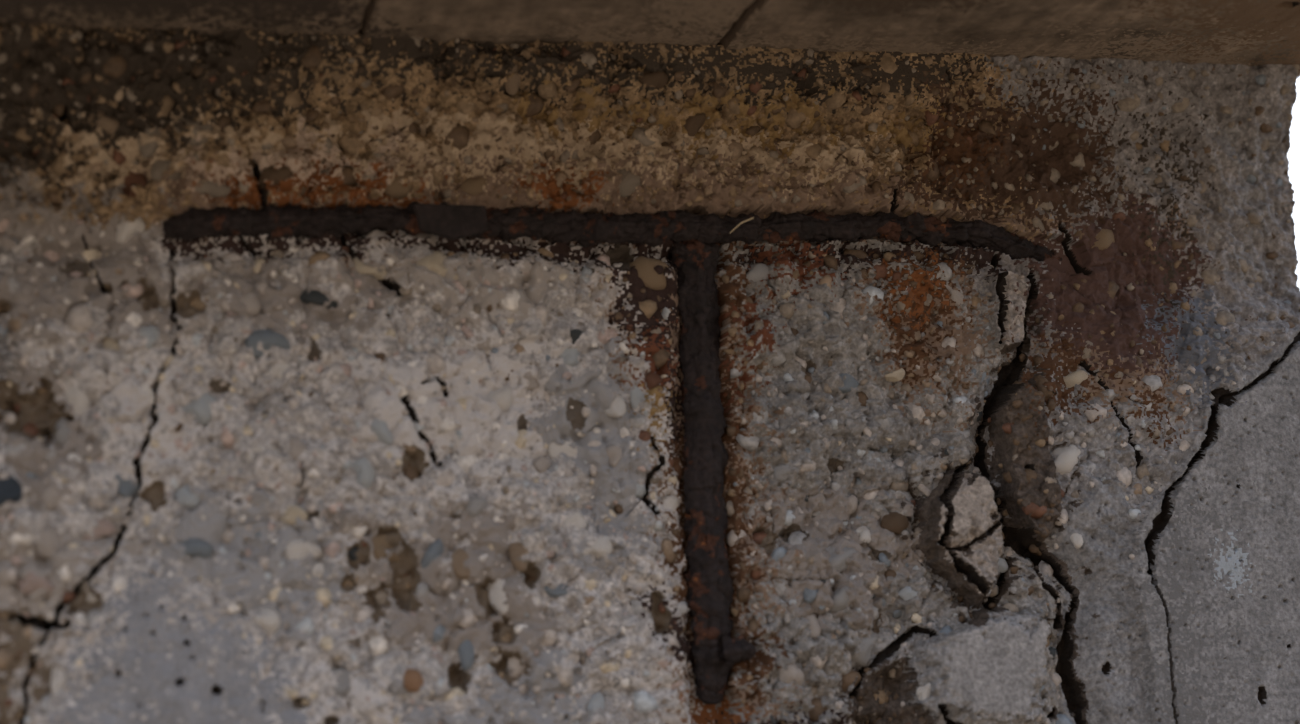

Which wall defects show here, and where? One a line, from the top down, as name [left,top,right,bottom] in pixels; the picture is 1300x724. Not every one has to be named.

rust [1119,0,1300,74]
leakage [0,0,1300,410]
crack [10,249,182,724]
leakage [81,329,236,498]
leakage [301,320,579,501]
spalling [475,577,498,618]
spalling [517,382,591,430]
rust [132,60,1222,724]
crack [849,625,940,697]
crack [938,223,1092,724]
crack [1144,332,1300,724]
spalling [1257,686,1267,705]